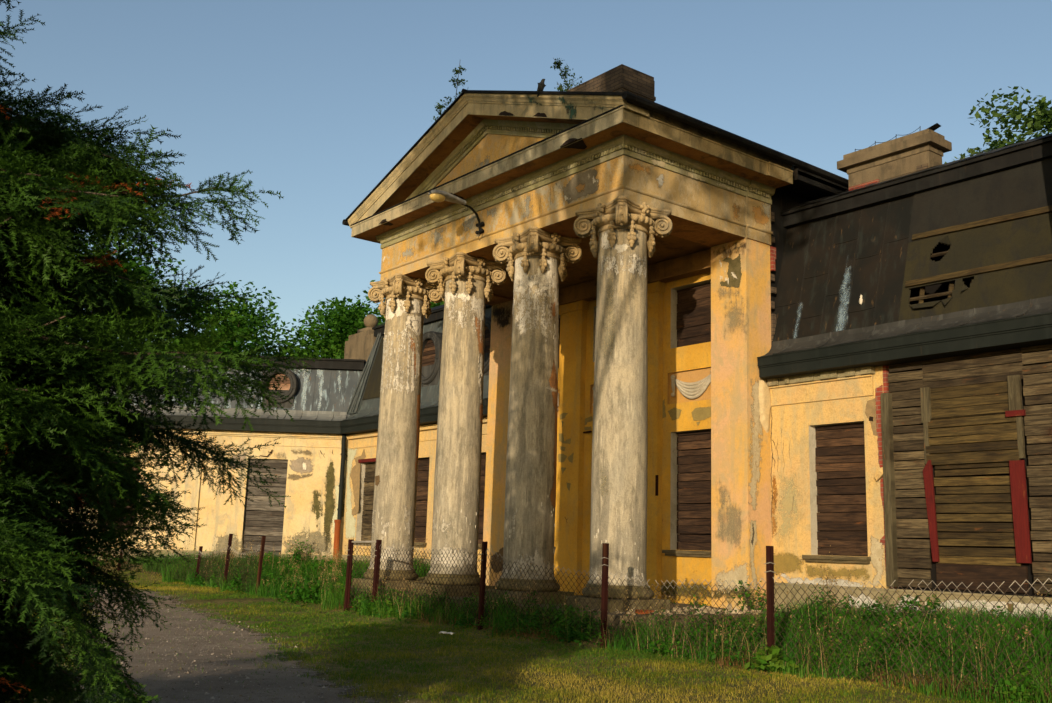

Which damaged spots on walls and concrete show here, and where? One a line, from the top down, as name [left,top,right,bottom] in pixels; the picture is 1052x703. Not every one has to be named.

flaking render [556,169,599,204]
peeling [599,233,646,278]
flaking render [720,254,742,288]
leakage [836,270,863,331]
peeling [380,298,421,482]
peeling [445,291,485,424]
peeling [512,257,574,526]
flaking render [288,450,313,480]
leakage [282,441,348,555]
peeling [491,508,555,575]